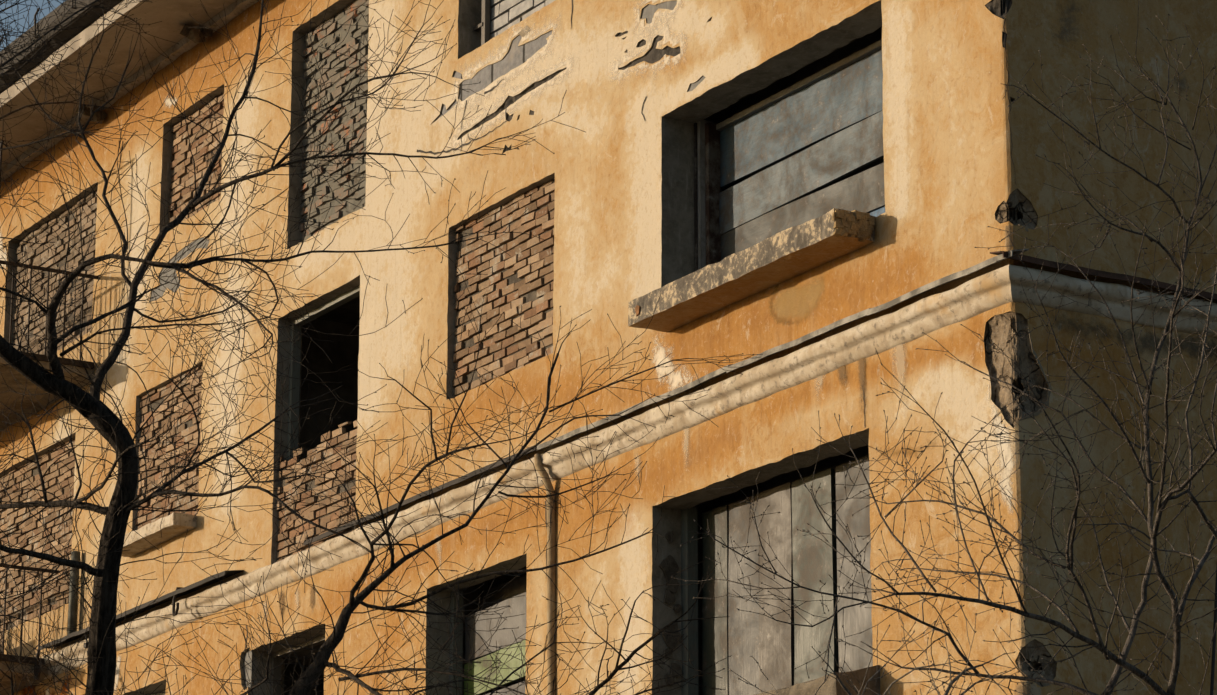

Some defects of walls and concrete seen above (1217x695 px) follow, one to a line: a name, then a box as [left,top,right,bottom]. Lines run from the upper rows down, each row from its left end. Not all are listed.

flaking render [437,21,557,120]
flaking render [611,0,687,81]
flaking render [985,0,1012,48]
flaking render [995,189,1037,231]
flaking render [984,312,1051,428]
flaking render [1015,640,1057,687]